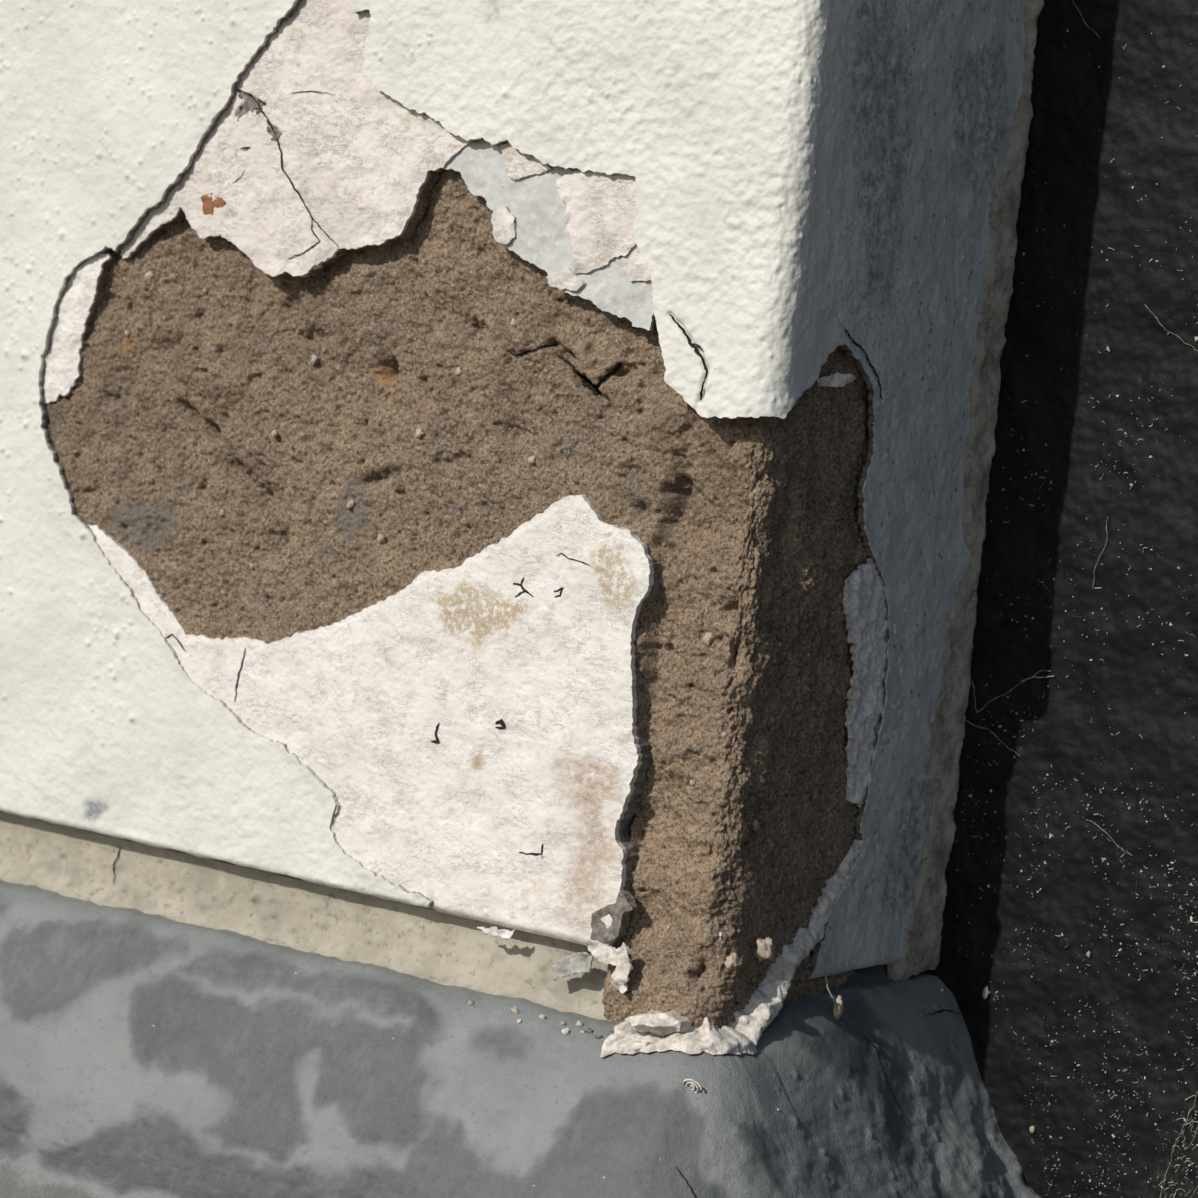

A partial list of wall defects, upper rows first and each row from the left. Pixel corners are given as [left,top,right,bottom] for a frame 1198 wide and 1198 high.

crack [232,89,338,259]
crack [505,343,621,395]
crack [669,314,708,401]
spalling [43,0,907,1057]
damp [46,980,720,1198]
damp [746,1126,781,1184]
damp [794,997,910,1157]